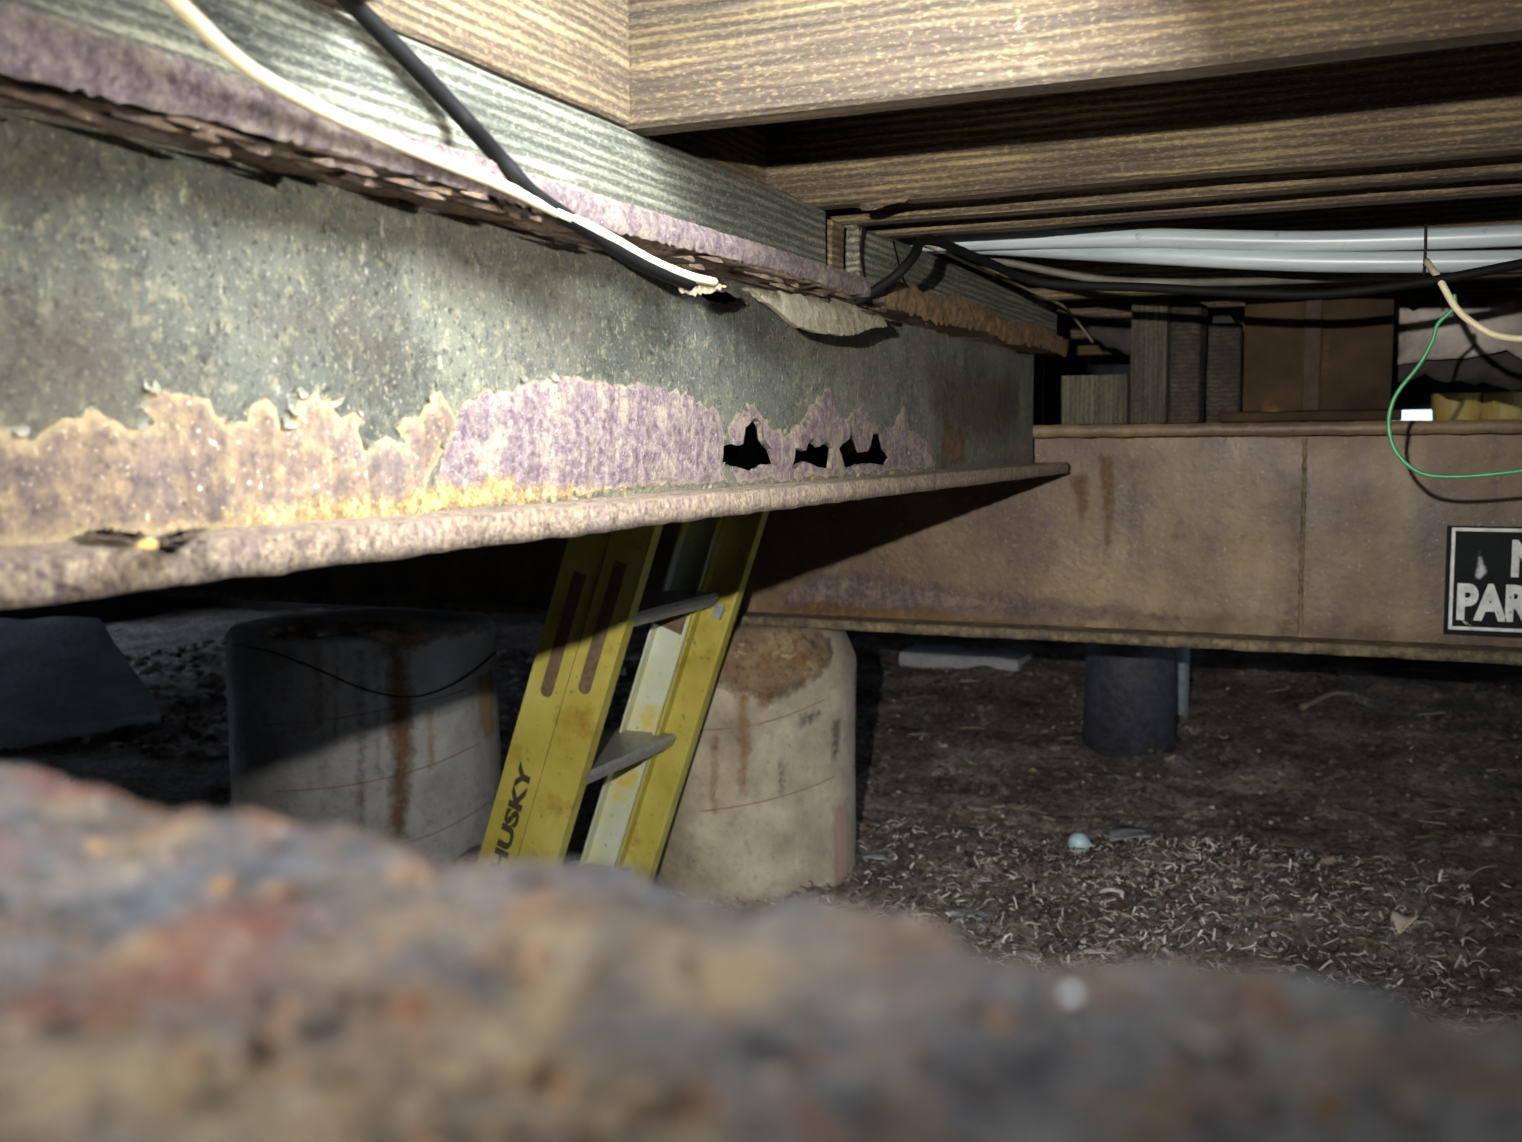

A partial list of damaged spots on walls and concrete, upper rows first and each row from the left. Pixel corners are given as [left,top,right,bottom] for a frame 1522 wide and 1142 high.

rust [225,476,627,525]
rust [388,652,413,841]